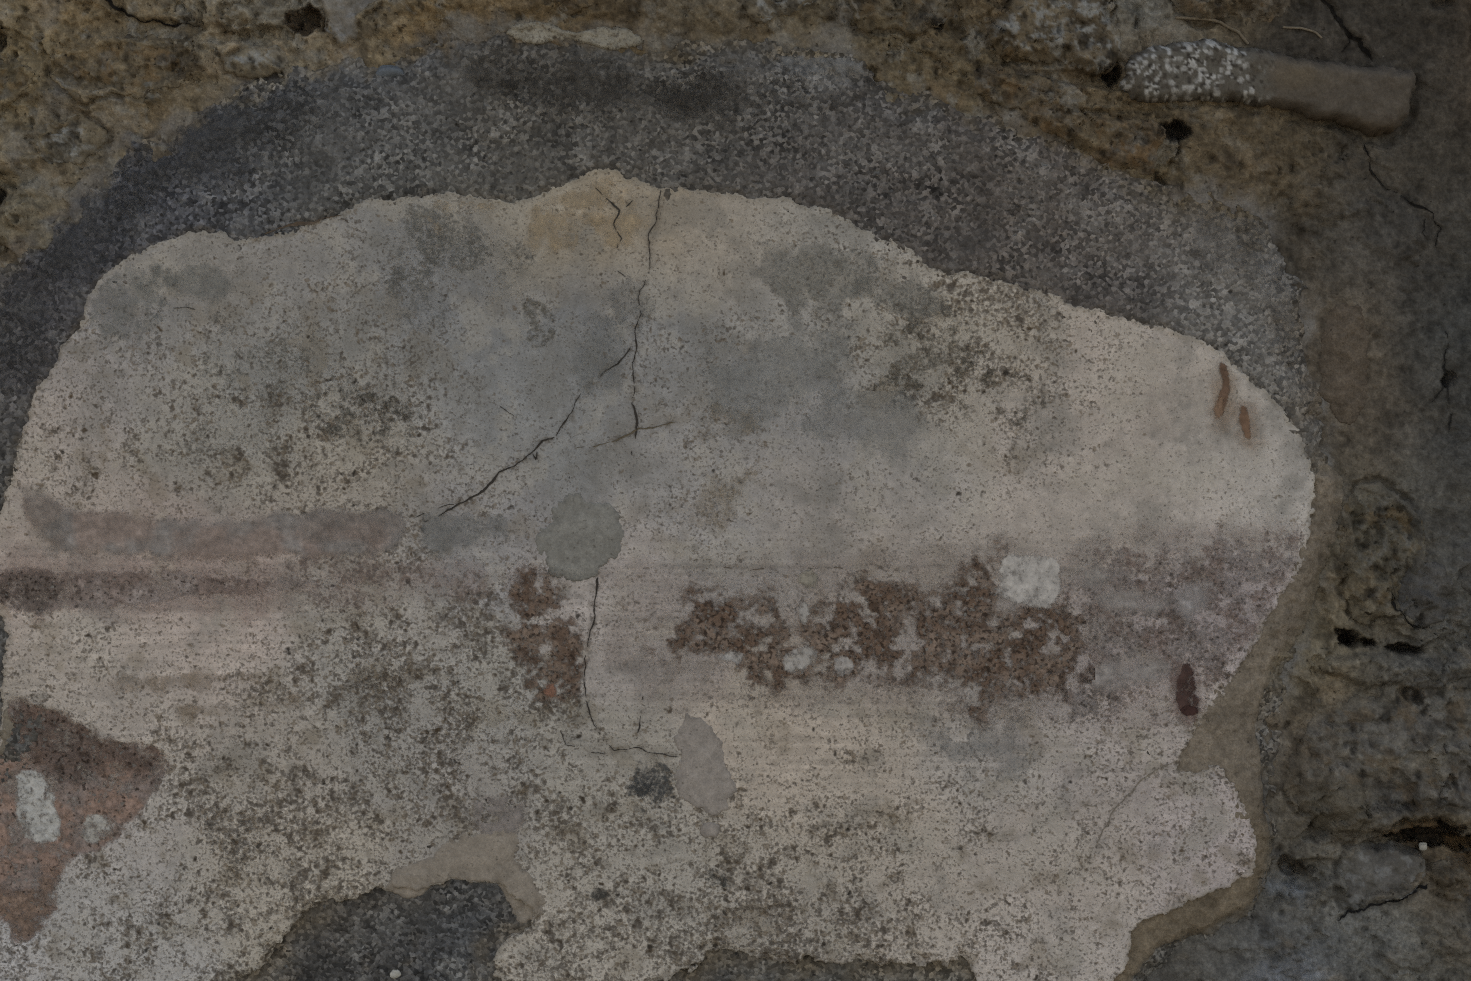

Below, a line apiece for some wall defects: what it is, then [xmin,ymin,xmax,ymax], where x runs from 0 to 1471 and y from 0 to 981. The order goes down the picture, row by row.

crack [1322,0,1372,60]
spalling [1159,120,1190,140]
crack [417,187,674,522]
peeling [0,568,303,615]
spalling [503,568,586,702]
crack [560,577,676,757]
spalling [651,535,1298,725]
peeling [0,699,168,941]